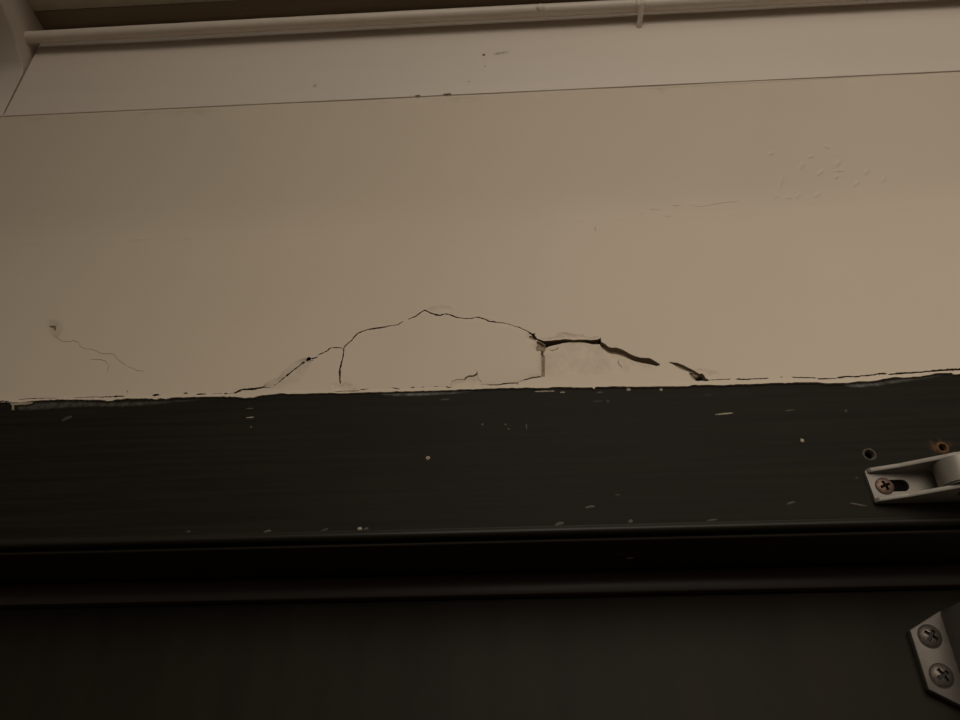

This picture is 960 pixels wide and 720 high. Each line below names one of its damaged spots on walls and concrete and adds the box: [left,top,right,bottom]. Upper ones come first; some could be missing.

crack [183,310,960,395]